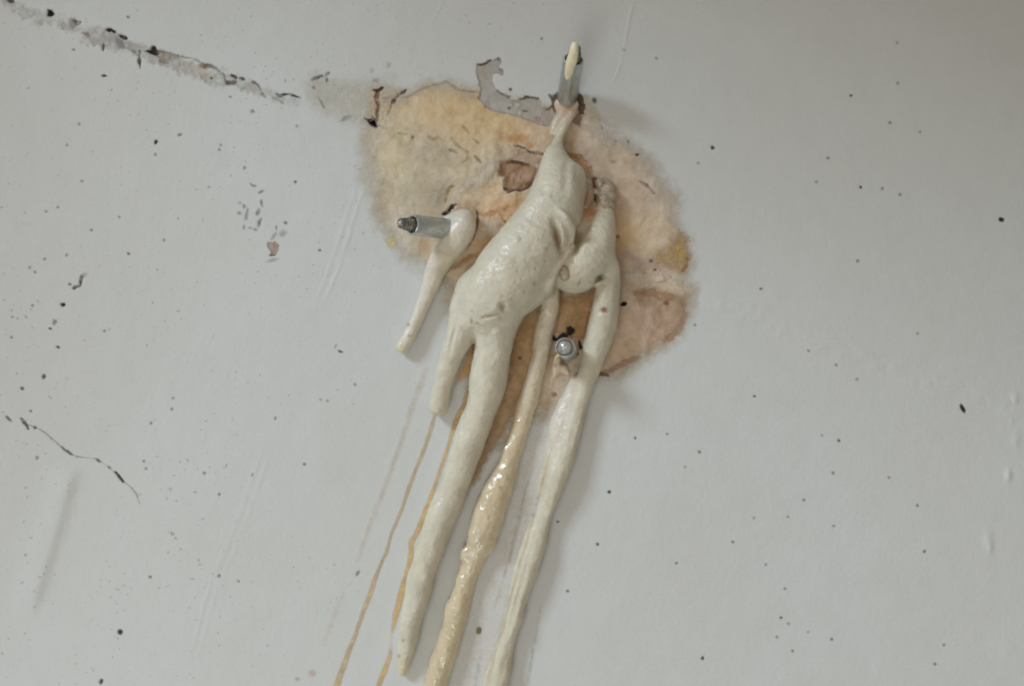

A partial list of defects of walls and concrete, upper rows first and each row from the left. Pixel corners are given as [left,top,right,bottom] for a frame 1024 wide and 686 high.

crack [41,9,299,98]
peeling [476,58,557,126]
damp [361,83,694,376]
damp [534,277,601,417]
crack [6,416,37,430]
crack [62,447,125,483]